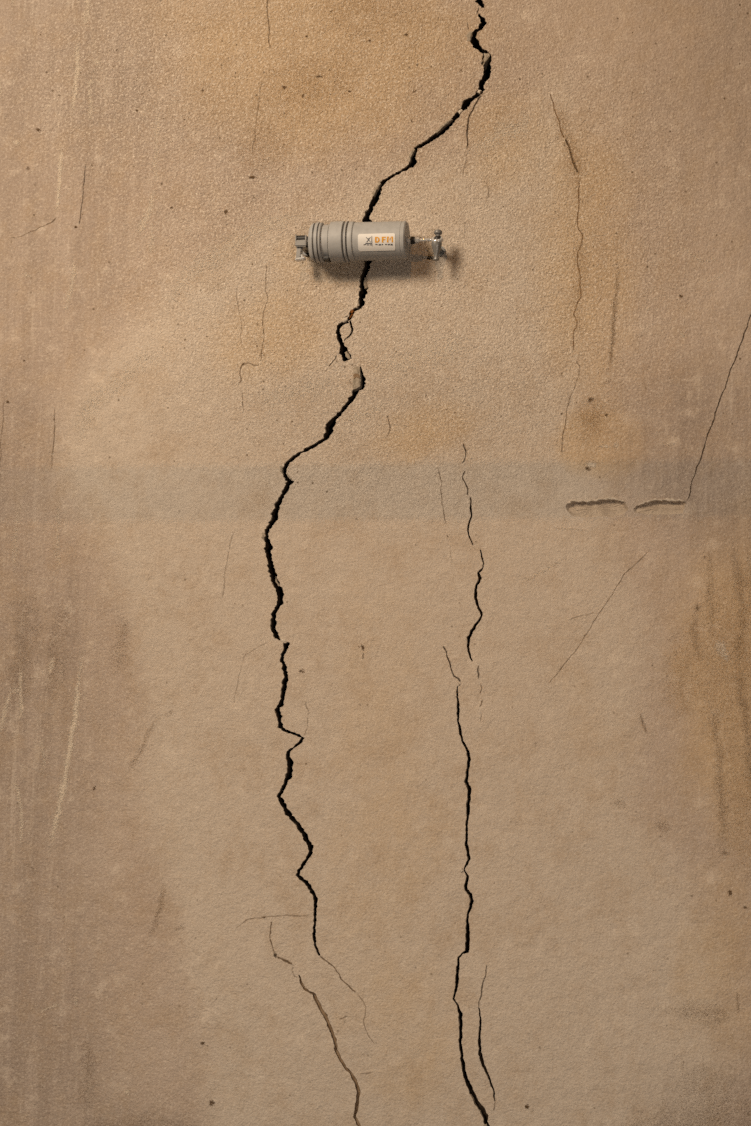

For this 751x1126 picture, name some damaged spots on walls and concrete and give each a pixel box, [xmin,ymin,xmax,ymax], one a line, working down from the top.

crack [362,0,492,222]
crack [687,315,751,500]
crack [261,261,372,992]
crack [439,444,495,1126]
crack [263,917,361,1126]